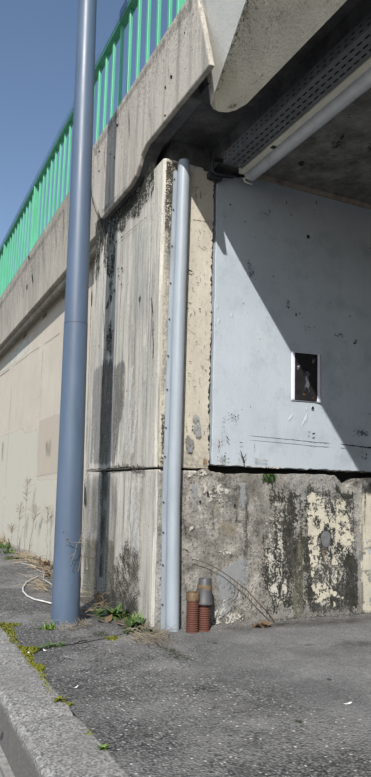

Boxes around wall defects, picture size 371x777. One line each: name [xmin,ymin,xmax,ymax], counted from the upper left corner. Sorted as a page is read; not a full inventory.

leakage [95,162,155,356]
leakage [164,161,178,294]
leakage [156,415,165,548]
leakage [257,481,371,621]
peeling [307,470,371,613]